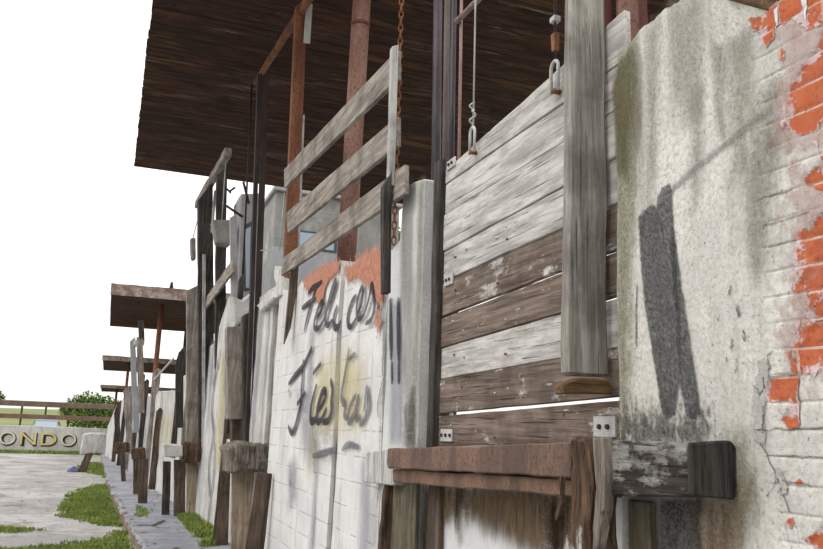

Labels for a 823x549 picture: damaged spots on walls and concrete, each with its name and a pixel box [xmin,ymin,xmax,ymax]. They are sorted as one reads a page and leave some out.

peeling [748,0,823,195]
peeling [752,213,823,445]
leakage [443,487,572,549]
crack [754,351,823,512]
spalling [775,468,803,495]
peeling [804,529,823,549]